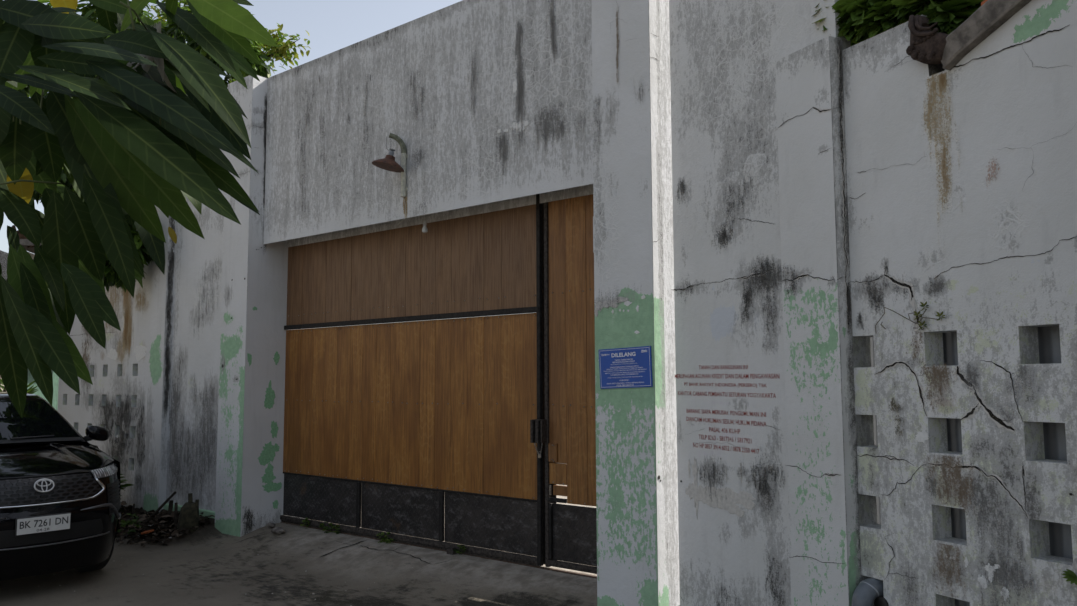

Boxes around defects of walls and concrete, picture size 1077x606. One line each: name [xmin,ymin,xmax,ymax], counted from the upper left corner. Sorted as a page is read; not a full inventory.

water stain [548,0,557,58]
crack [953,25,1072,68]
water stain [497,21,611,175]
corrosion [924,73,959,205]
water stain [716,179,753,249]
crack [671,46,1074,334]
water stain [740,258,795,347]
water stain [98,395,146,467]
water stain [164,217,215,492]
peeling [264,380,275,409]
peeling [258,421,282,509]
water stain [741,452,785,511]